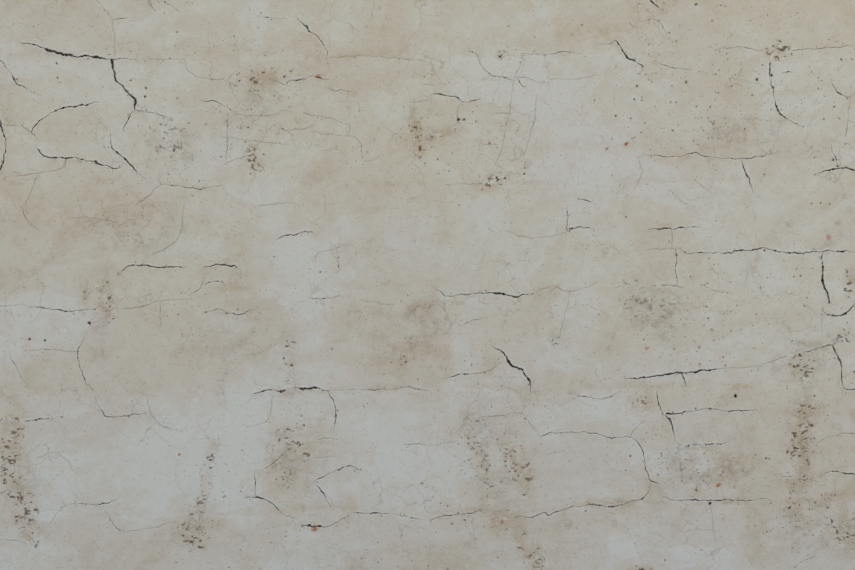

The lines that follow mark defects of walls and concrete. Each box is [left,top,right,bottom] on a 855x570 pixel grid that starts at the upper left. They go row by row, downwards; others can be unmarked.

crack [0,0,241,271]
crack [127,264,242,309]
crack [436,287,587,337]
crack [629,227,854,316]
crack [444,348,531,393]
crack [737,343,855,390]
crack [247,387,480,528]
crack [491,369,767,523]